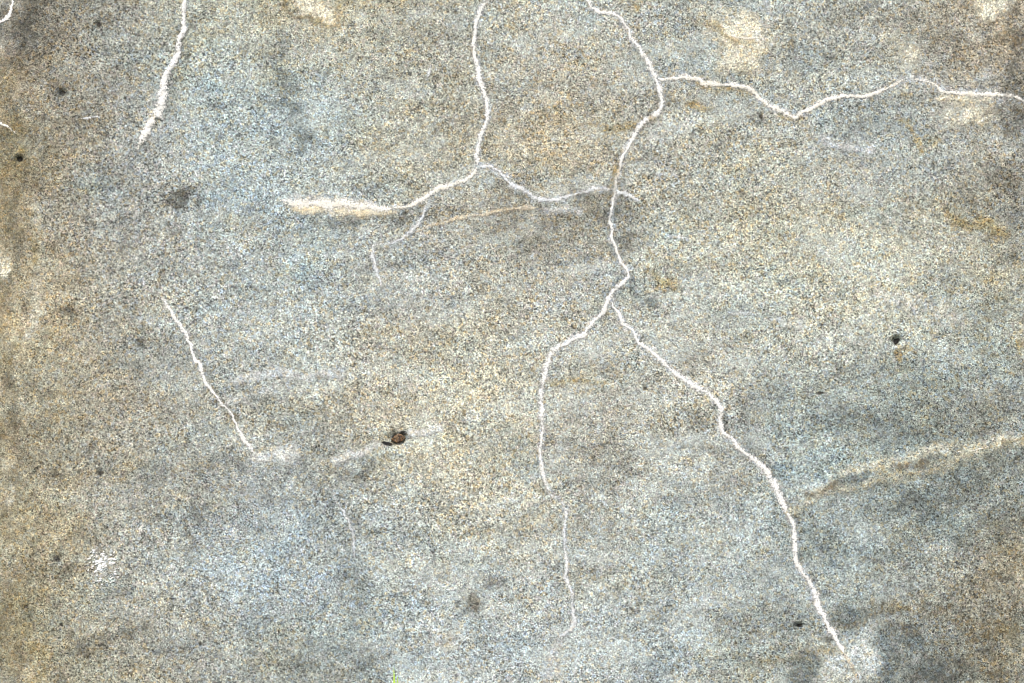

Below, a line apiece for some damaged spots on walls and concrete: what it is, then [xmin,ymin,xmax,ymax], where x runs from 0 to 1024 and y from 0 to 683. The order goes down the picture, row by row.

crack [137,0,189,150]
crack [142,278,255,454]
crack [280,0,1024,679]